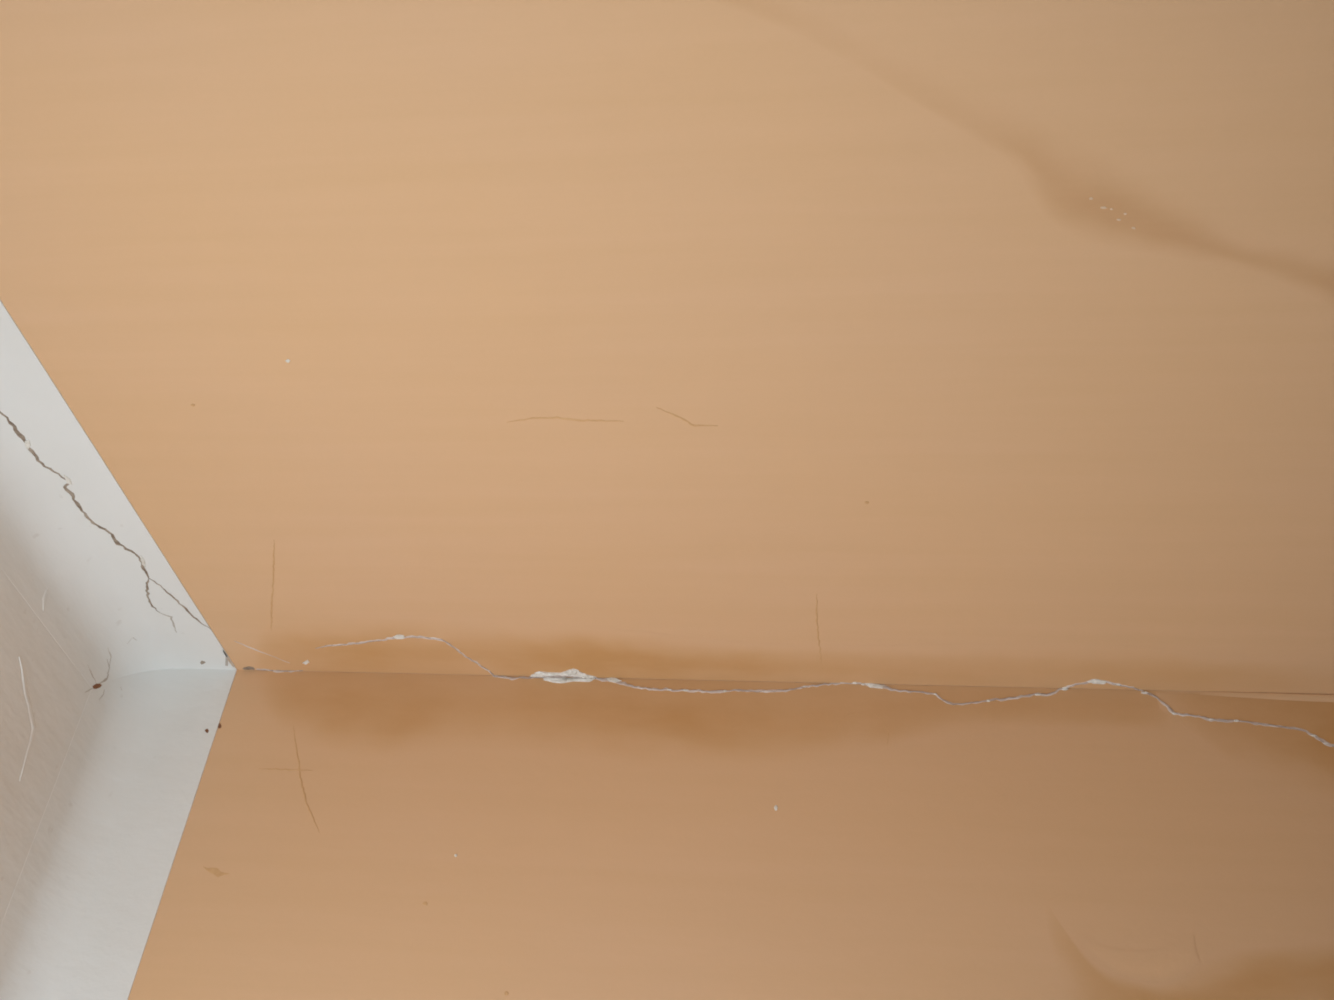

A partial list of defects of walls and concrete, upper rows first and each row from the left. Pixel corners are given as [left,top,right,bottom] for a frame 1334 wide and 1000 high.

crack [0,411,532,680]
crack [86,639,137,700]
crack [596,594,1334,747]